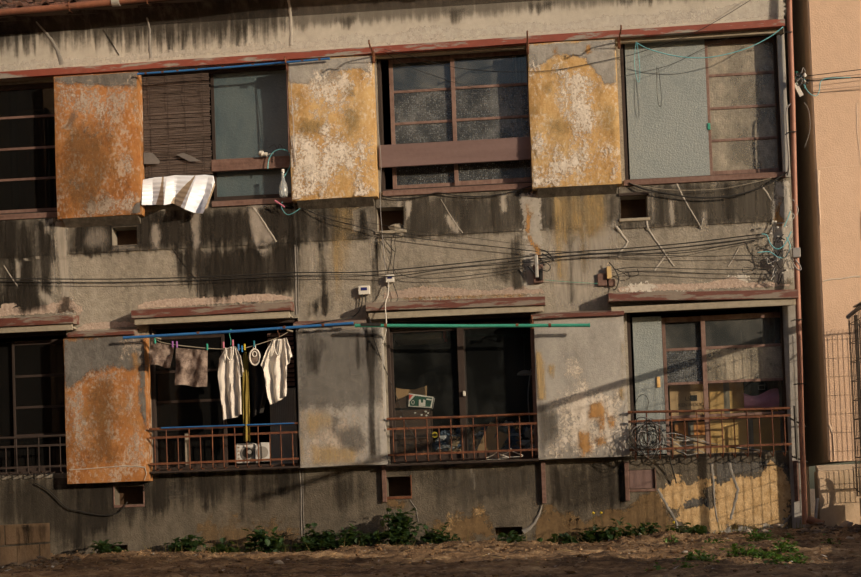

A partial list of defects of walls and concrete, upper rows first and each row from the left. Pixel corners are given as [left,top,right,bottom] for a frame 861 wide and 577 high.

water stain [0,0,779,87]
peeling [291,62,375,199]
peeling [519,64,618,297]
water stain [383,190,616,306]
water stain [0,205,368,422]
water stain [299,327,383,456]
peeling [545,355,627,458]
peeling [534,459,791,542]